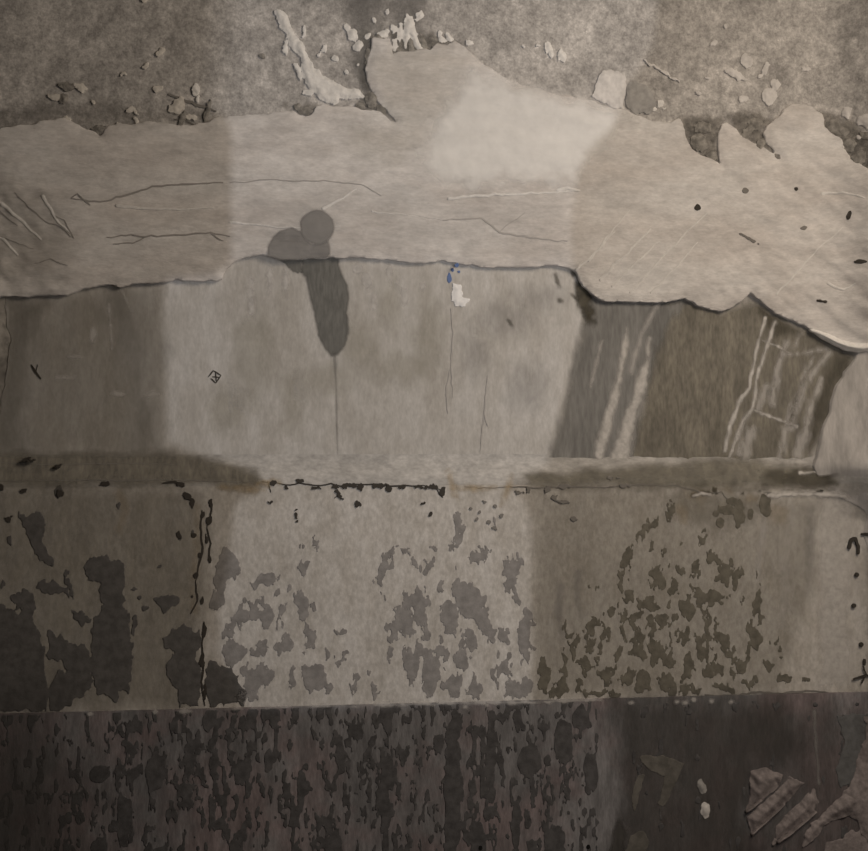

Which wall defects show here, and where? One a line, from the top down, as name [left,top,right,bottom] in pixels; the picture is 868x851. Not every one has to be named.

spalling [364,32,446,65]
spalling [683,119,720,160]
spalling [734,114,781,159]
spalling [822,113,868,168]
crack [71,179,381,205]
crack [0,194,74,266]
crack [107,232,230,244]
water stain [268,210,349,374]
crack [261,481,443,499]
spalling [332,483,446,508]
water stain [530,272,851,679]
peeling [0,499,810,851]